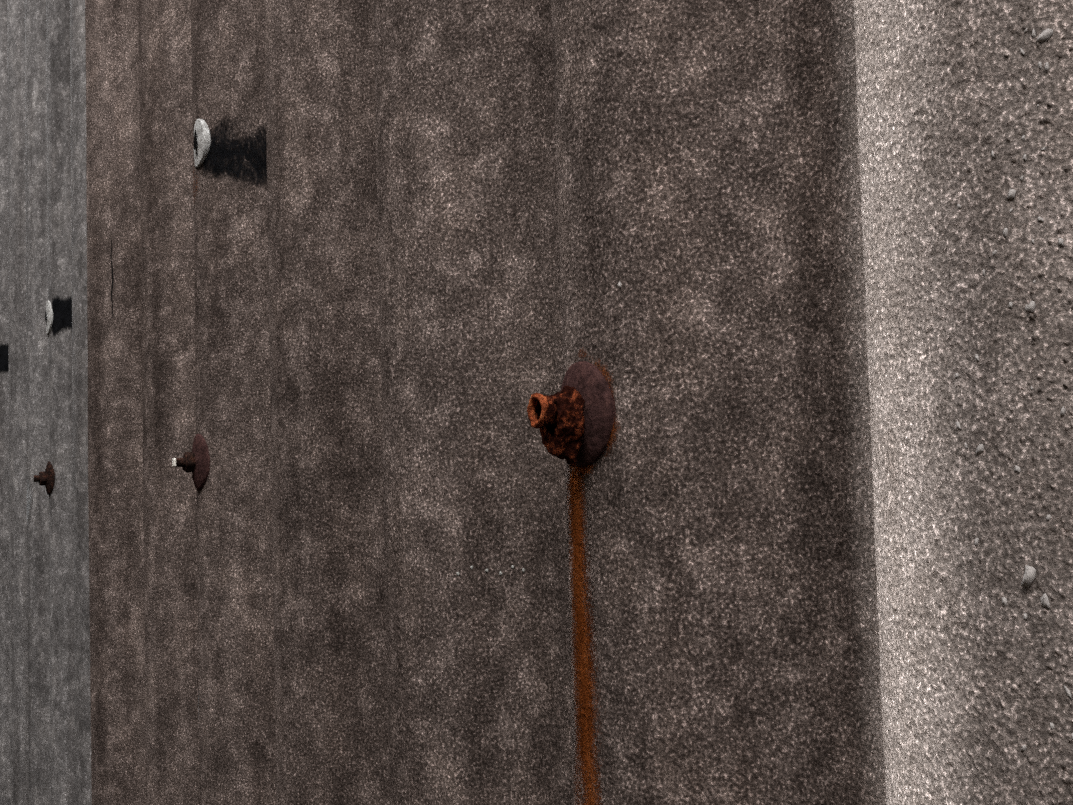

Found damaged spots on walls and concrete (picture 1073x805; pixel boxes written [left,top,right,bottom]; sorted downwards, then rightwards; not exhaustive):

rust [567,464,600,805]